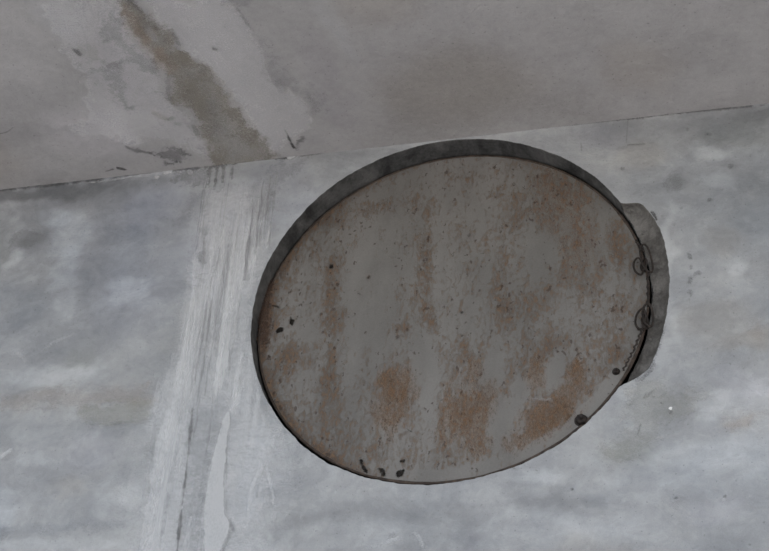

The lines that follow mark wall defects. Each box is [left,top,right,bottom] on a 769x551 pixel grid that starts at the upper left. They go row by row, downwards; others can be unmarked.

leakage [204,412,230,551]